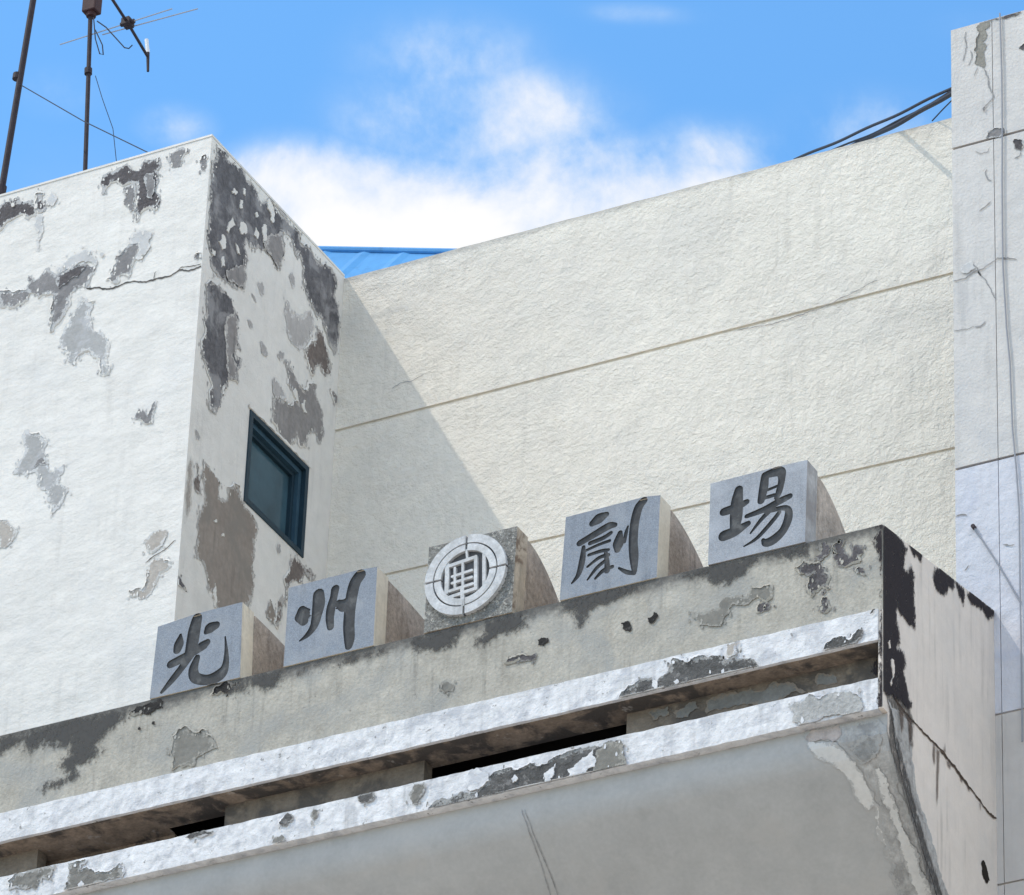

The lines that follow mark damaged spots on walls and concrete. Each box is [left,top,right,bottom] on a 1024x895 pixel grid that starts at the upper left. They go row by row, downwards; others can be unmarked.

crack [963,31,994,111]
crack [86,264,201,290]
peeling [0,143,341,448]
crack [954,257,1015,331]
peeling [12,429,72,518]
peeling [127,529,187,600]
peeling [194,459,259,609]
peeling [794,538,871,614]
spalling [618,641,758,698]
peeling [166,725,218,773]
peeling [406,739,629,810]
spalling [648,673,949,895]